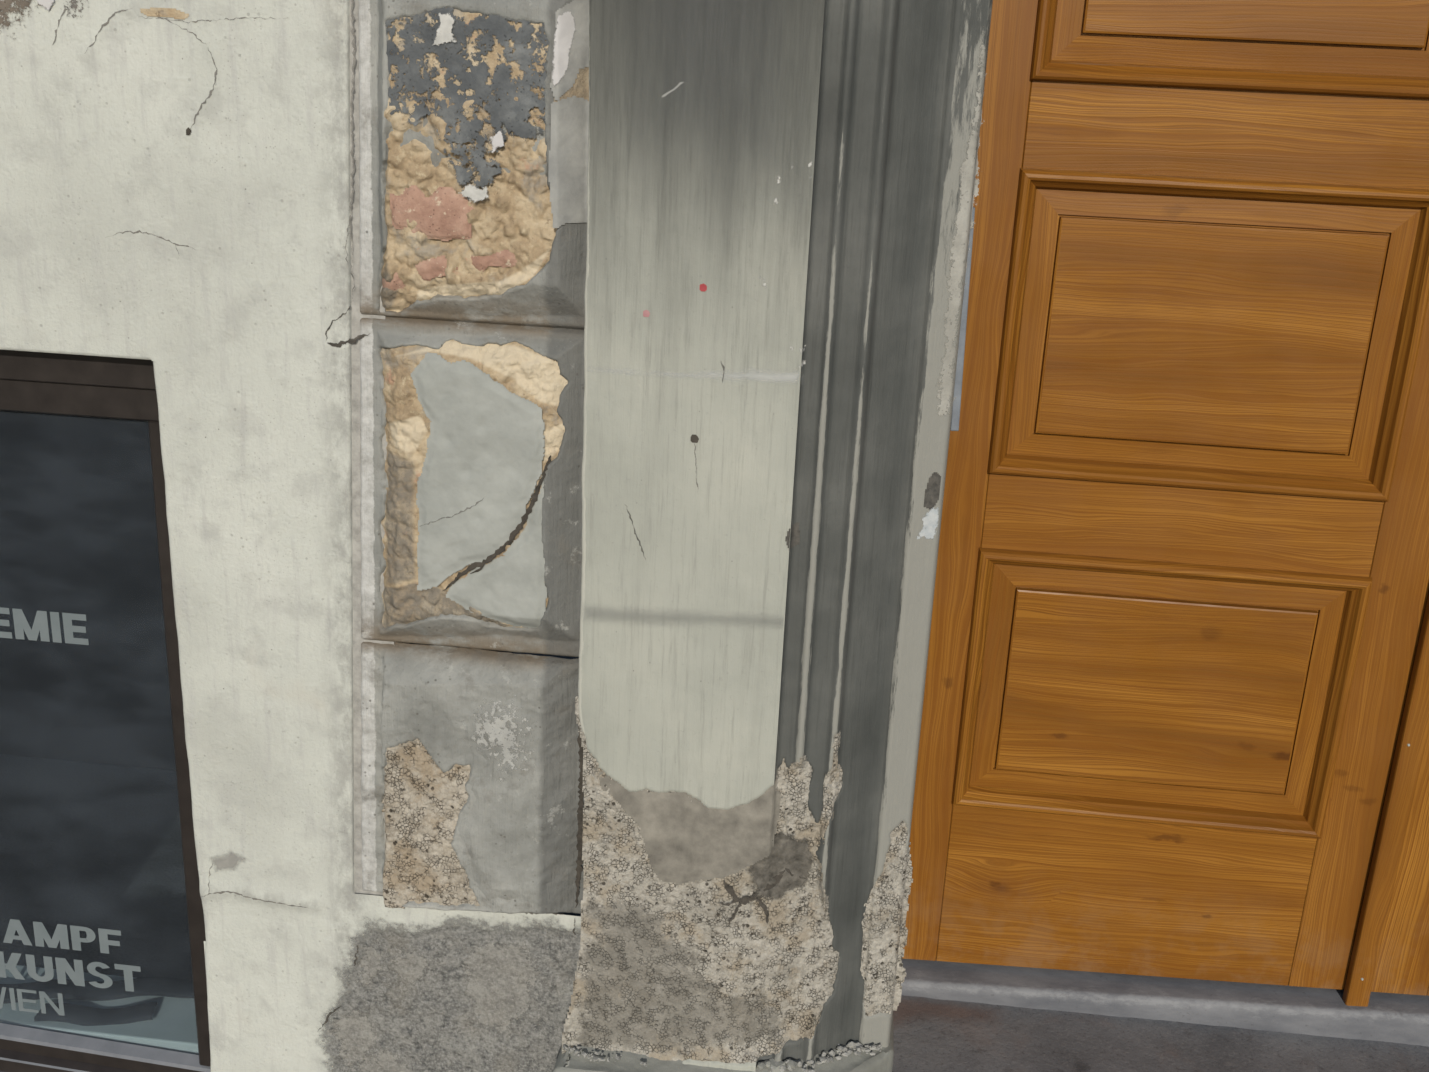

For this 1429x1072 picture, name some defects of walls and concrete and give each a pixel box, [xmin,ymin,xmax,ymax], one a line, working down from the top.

peeling [0,0,42,27]
crack [89,10,126,47]
crack [166,19,217,135]
spalling [140,7,246,23]
spalling [380,0,589,312]
spalling [380,340,568,628]
crack [443,455,551,591]
spalling [322,695,843,1072]
spalling [860,821,913,1016]